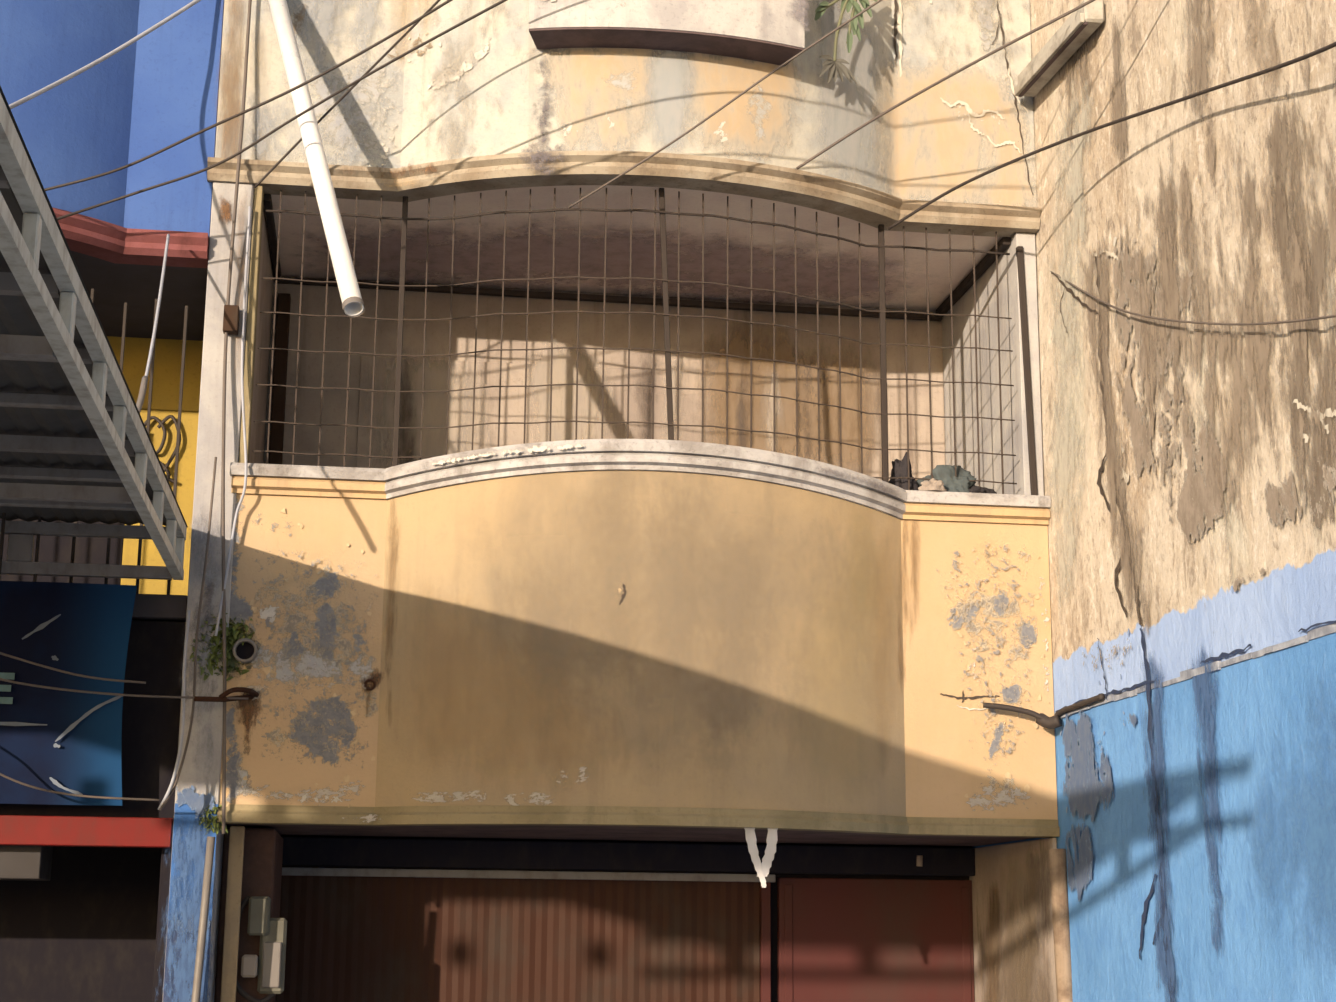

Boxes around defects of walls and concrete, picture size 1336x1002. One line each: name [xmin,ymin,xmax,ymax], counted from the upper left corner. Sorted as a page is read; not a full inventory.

crack [893,0,903,77]
peeling [877,58,1038,207]
crack [940,0,1033,195]
water stain [377,354,483,463]
water stain [532,342,612,442]
water stain [704,328,888,489]
water stain [1050,0,1336,629]
rust [238,693,260,752]
peeling [176,499,381,823]
rust [362,671,381,706]
peeling [936,544,1050,813]
spalling [1060,710,1115,901]